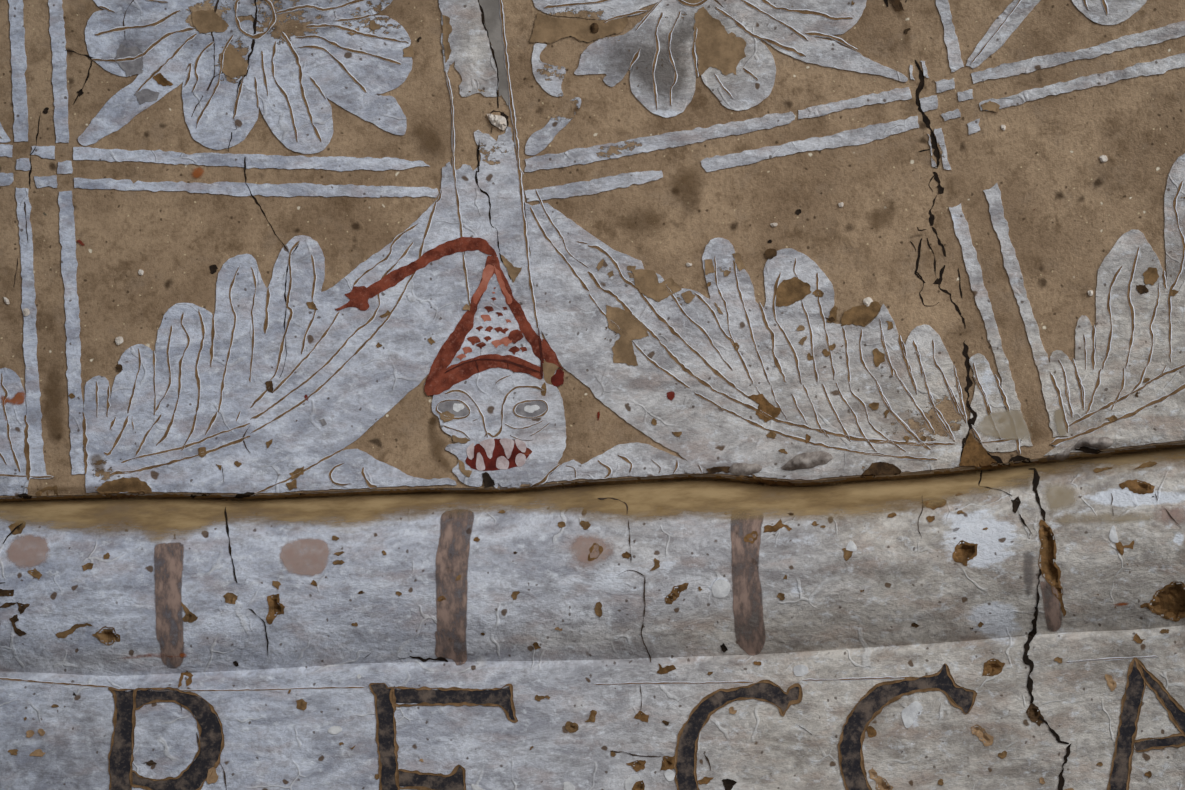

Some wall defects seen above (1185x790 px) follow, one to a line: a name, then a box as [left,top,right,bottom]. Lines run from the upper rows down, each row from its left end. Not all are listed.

crack [475,0,511,279]
crack [191,0,299,378]
flaking render [776,277,824,307]
flaking render [826,301,893,330]
crack [910,60,1046,536]
flaking render [1119,461,1157,497]
flaking render [924,493,965,522]
flaking render [952,528,978,566]
flaking render [0,589,30,636]
flaking render [1140,581,1185,633]
crack [1023,569,1071,790]